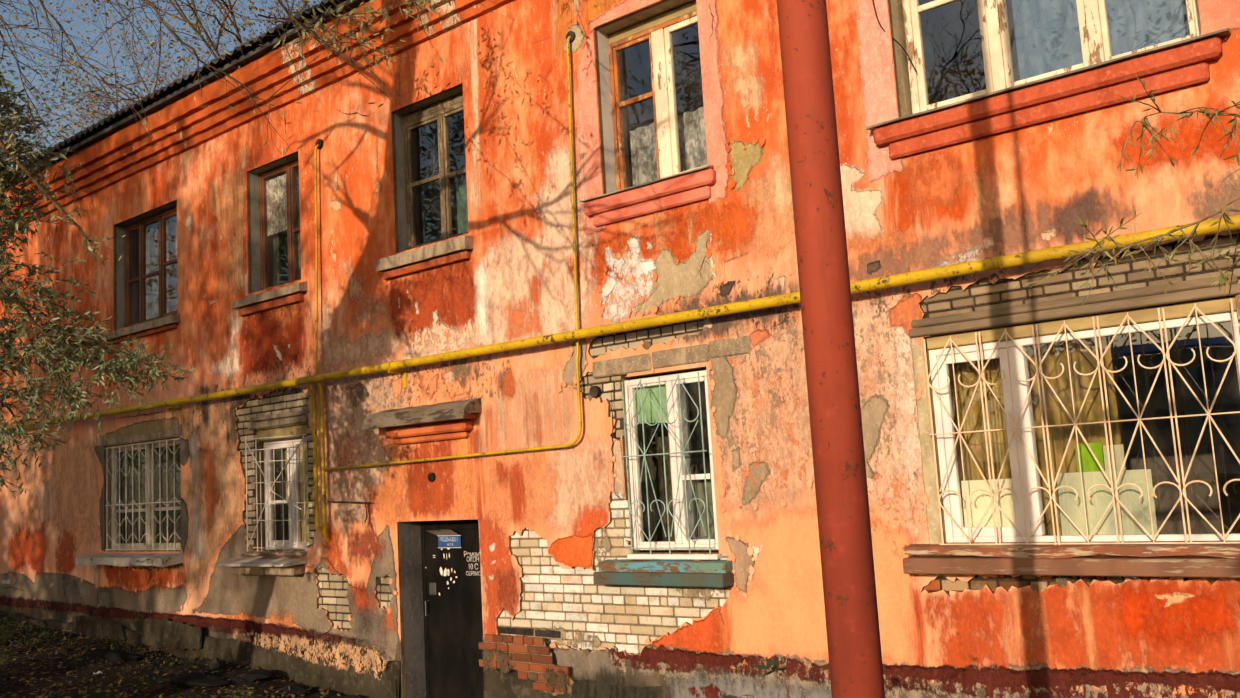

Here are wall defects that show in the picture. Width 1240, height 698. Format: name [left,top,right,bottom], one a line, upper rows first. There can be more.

peeling [725,138,765,189]
peeling [1041,229,1056,241]
flaking render [236,388,316,549]
flaking render [557,236,815,516]
flaking render [852,234,1240,550]
flaking render [317,567,354,630]
flaking render [376,575,397,615]
flaking render [479,492,756,696]